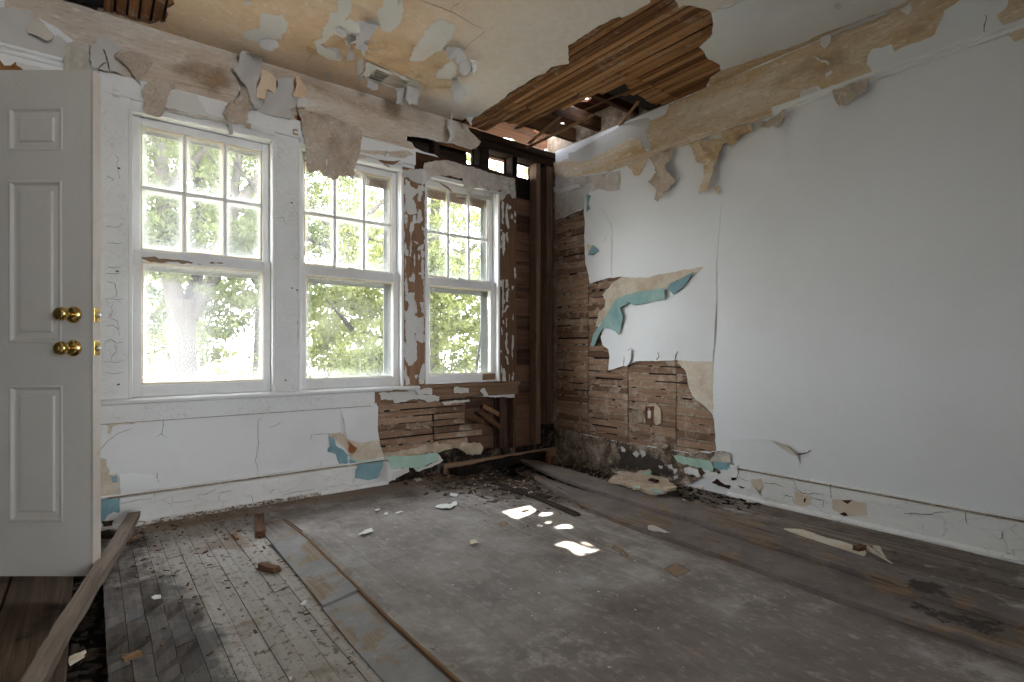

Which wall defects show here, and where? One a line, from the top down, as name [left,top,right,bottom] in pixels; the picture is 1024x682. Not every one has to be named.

peeling [997,0,1024,42]
peeling [4,0,960,503]
crack [105,226,122,374]
peeling [101,458,121,521]
crack [737,471,831,504]
peeling [832,499,867,516]